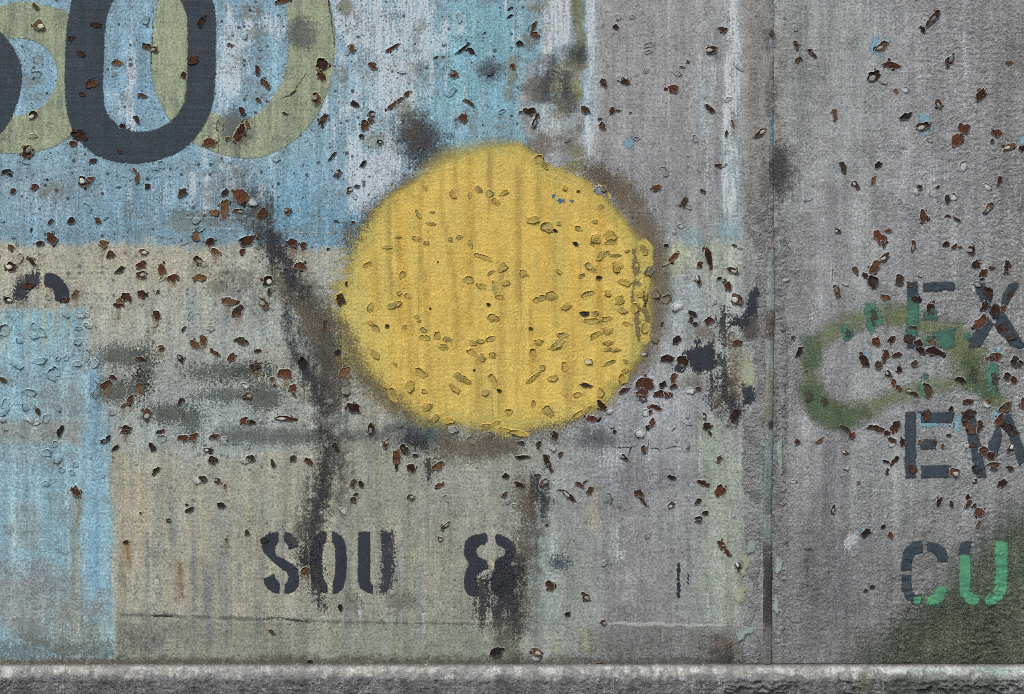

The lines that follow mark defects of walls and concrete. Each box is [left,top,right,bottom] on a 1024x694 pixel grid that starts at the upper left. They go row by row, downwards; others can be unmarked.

peeling [918,8,941,34]
peeling [899,111,932,132]
peeling [327,151,361,194]
peeling [258,275,274,311]
peeling [334,281,348,306]
peeling [635,239,671,357]
peeling [721,266,743,305]
peeling [833,265,883,335]
peeling [953,354,1024,413]
leakage [255,220,611,616]
peeling [193,447,222,485]
leakage [472,471,555,662]